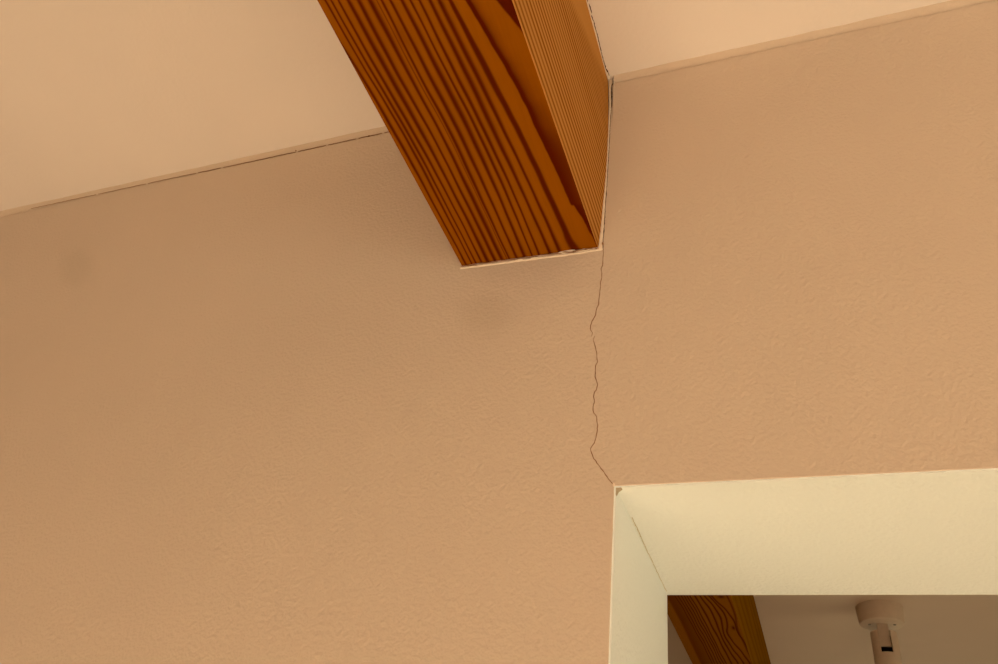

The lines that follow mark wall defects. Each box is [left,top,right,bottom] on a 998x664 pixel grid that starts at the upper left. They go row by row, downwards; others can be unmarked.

crack [586,0,613,484]